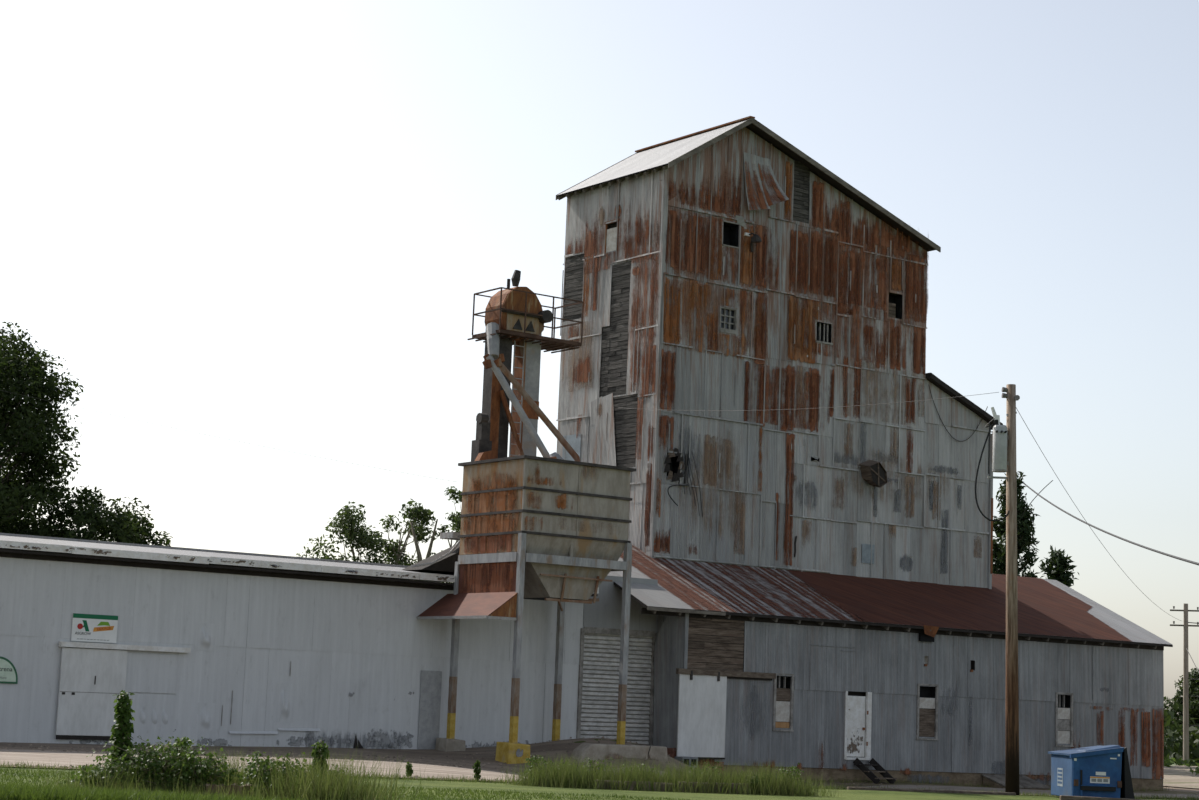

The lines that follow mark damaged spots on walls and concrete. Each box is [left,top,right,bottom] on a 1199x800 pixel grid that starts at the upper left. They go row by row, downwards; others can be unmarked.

corrosion [463,370,566,593]
corrosion [563,161,1131,641]
corrosion [1094,706,1164,779]